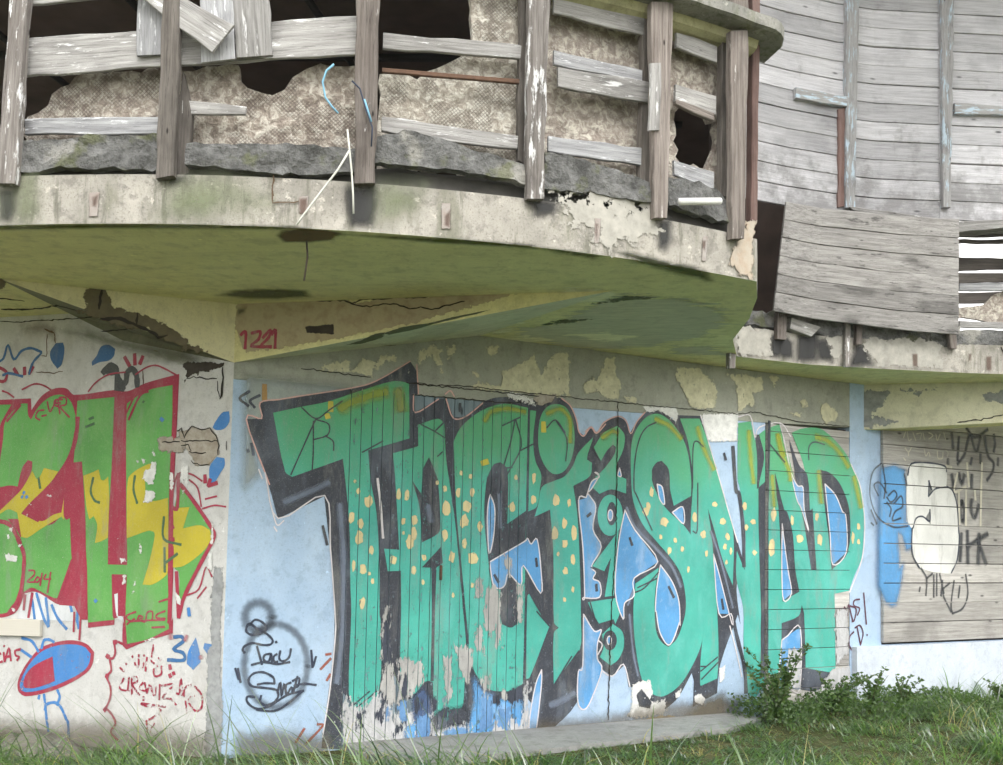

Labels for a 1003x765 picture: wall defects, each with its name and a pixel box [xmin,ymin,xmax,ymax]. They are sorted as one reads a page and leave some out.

spalling [728,218,757,281]
spalling [76,288,224,399]
peeling [471,316,678,424]
peeling [675,367,779,443]
peeling [864,388,936,429]
crack [957,415,1003,423]
peeling [982,389,1003,404]
spalling [136,426,227,503]